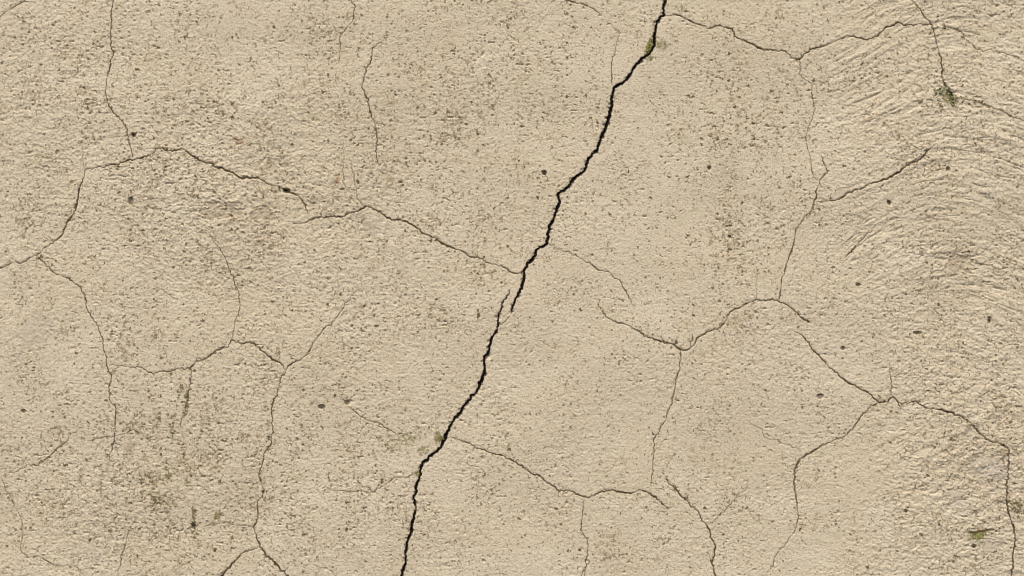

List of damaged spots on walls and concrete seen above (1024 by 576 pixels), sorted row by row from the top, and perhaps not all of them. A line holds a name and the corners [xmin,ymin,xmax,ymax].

crack [0,0,357,576]
crack [282,0,954,576]
crack [793,332,1016,576]